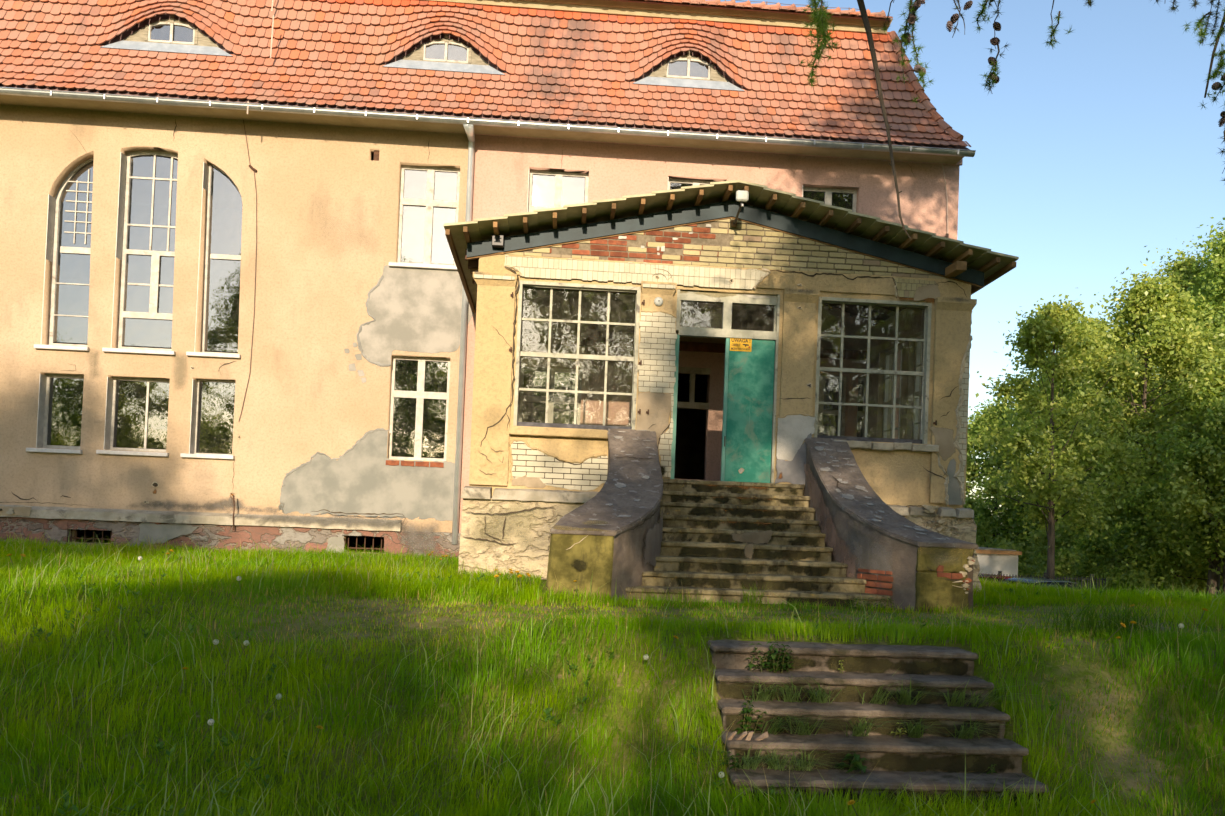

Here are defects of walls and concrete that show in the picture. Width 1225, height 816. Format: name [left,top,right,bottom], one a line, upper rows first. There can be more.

spalling [474,221,771,290]
crack [480,266,519,447]
spalling [509,440,608,491]
crack [536,420,671,465]
peeling [776,413,815,461]
spalling [921,310,973,535]
spalling [857,568,893,596]